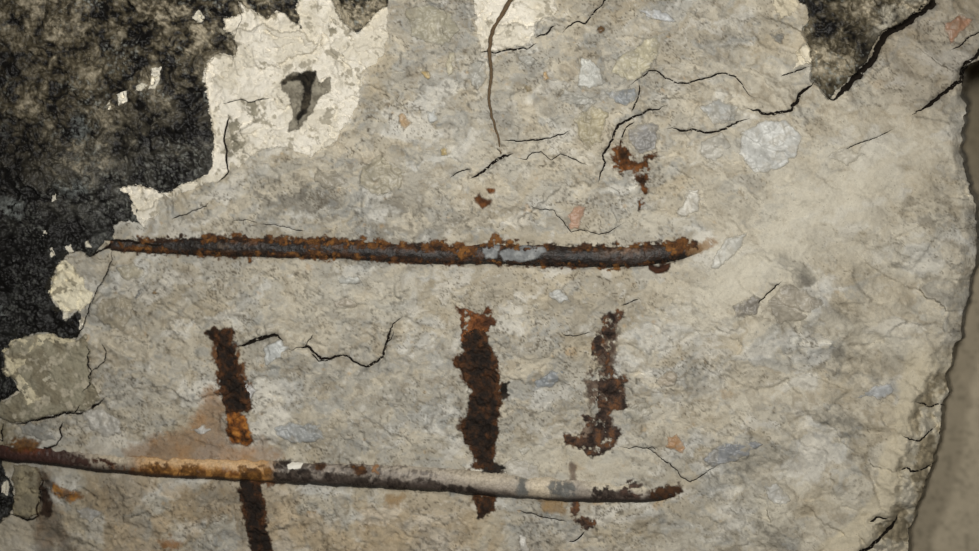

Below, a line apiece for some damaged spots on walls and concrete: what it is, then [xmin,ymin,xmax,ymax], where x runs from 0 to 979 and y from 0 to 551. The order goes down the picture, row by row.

peeling [163,0,389,198]
crack [451,0,936,182]
crack [914,32,979,114]
rust [610,141,657,211]
spalling [739,120,801,173]
water stain [0,199,20,216]
rust [119,232,698,273]
peeling [48,260,93,321]
crack [239,317,402,368]
spalling [0,461,251,551]
rust [238,460,482,493]
rust [592,480,683,500]